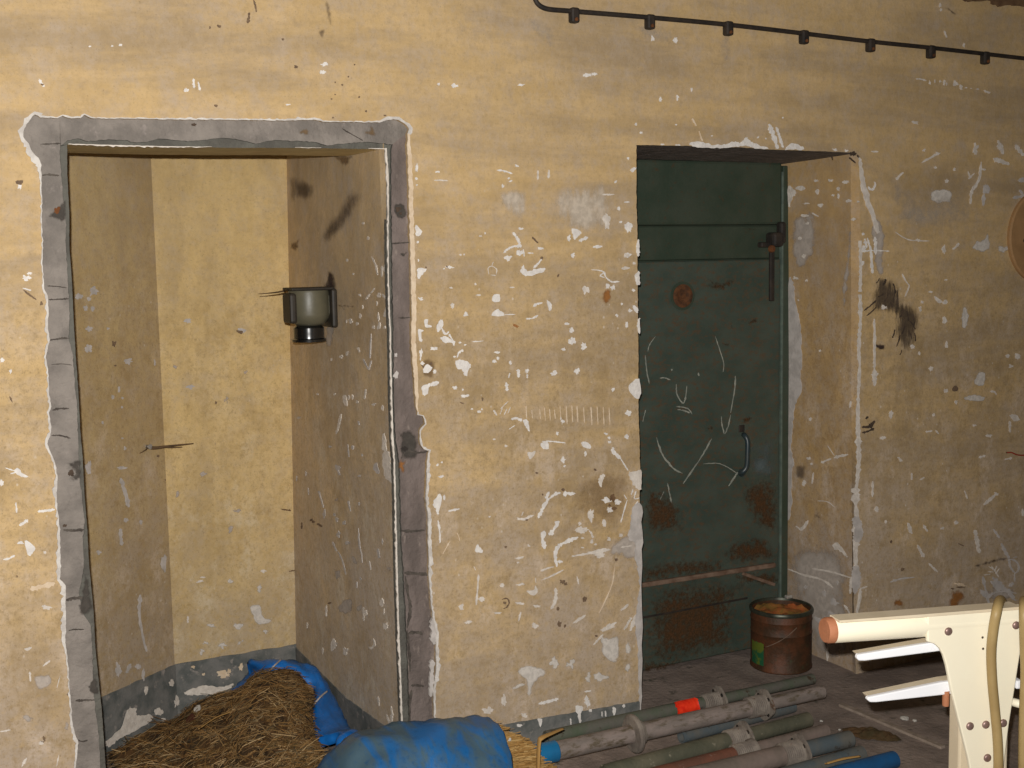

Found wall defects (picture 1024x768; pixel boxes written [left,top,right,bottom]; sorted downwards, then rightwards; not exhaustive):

peeling [660,117,804,150]
peeling [503,227,545,276]
peeling [787,179,860,282]
peeling [474,283,552,320]
water stain [866,278,916,355]
flaking render [3,112,471,768]
peeling [794,218,884,655]
peeling [499,578,540,608]
flaking render [515,468,643,710]
peeling [482,656,575,714]